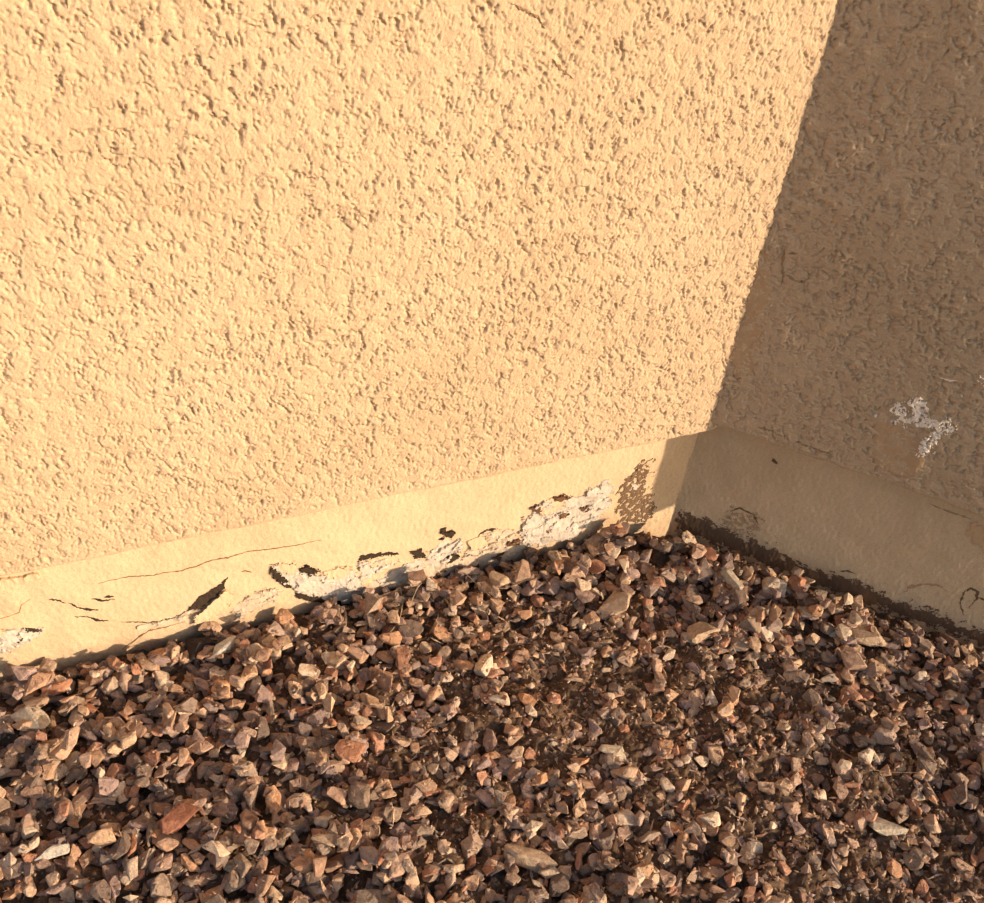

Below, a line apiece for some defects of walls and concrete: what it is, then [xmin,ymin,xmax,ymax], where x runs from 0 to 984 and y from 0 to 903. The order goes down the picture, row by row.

peeling [529,493,590,519]
crack [0,540,321,649]
peeling [0,627,45,654]